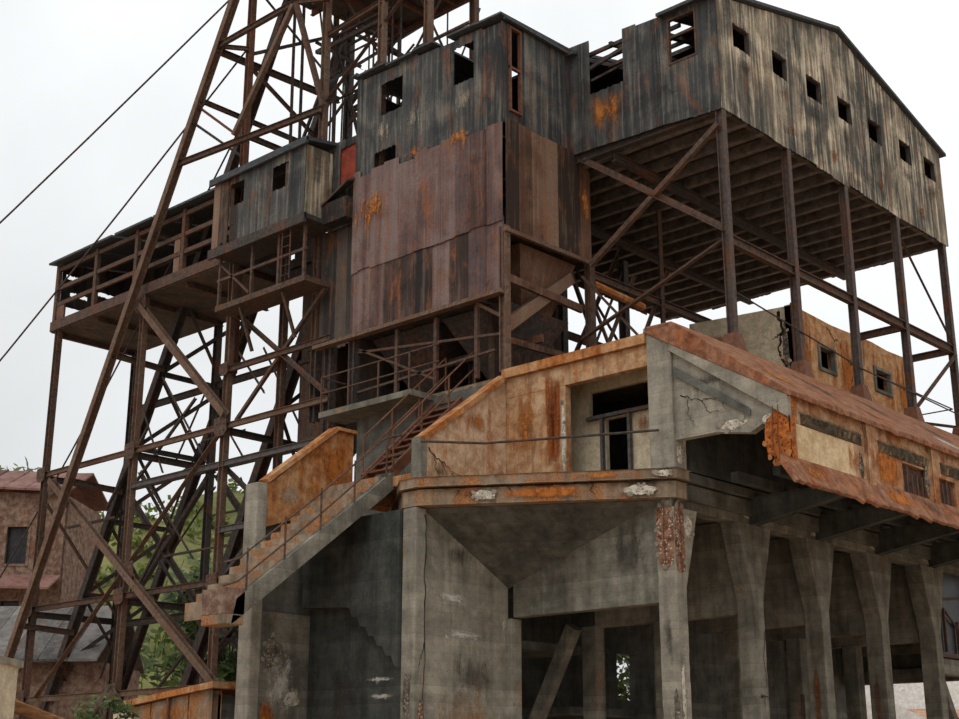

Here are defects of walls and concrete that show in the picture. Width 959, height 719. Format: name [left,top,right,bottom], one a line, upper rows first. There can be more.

rust [545,380,560,461]
crack [680,395,726,426]
spalling [762,404,794,466]
spalling [471,489,496,501]
spalling [619,442,695,572]
crack [418,515,427,719]
flaking render [281,687,300,710]